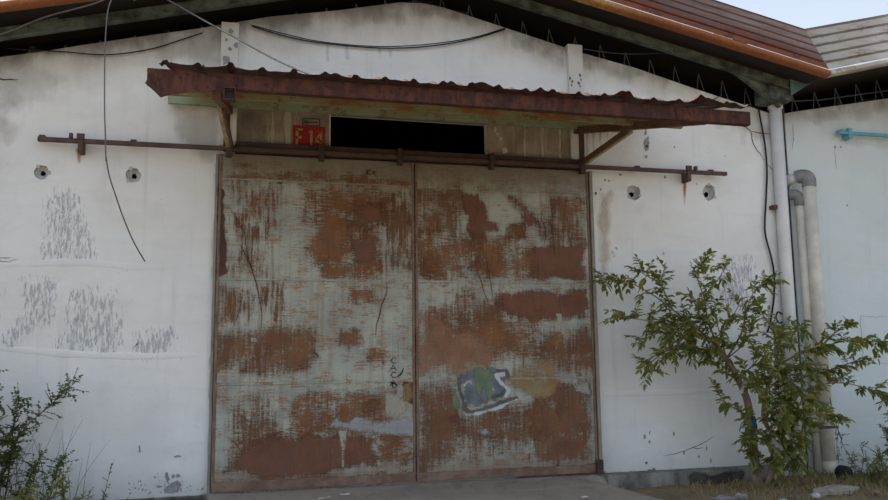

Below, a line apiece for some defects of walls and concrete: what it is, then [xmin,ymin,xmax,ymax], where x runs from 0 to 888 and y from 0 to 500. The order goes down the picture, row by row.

rust [216,164,596,492]